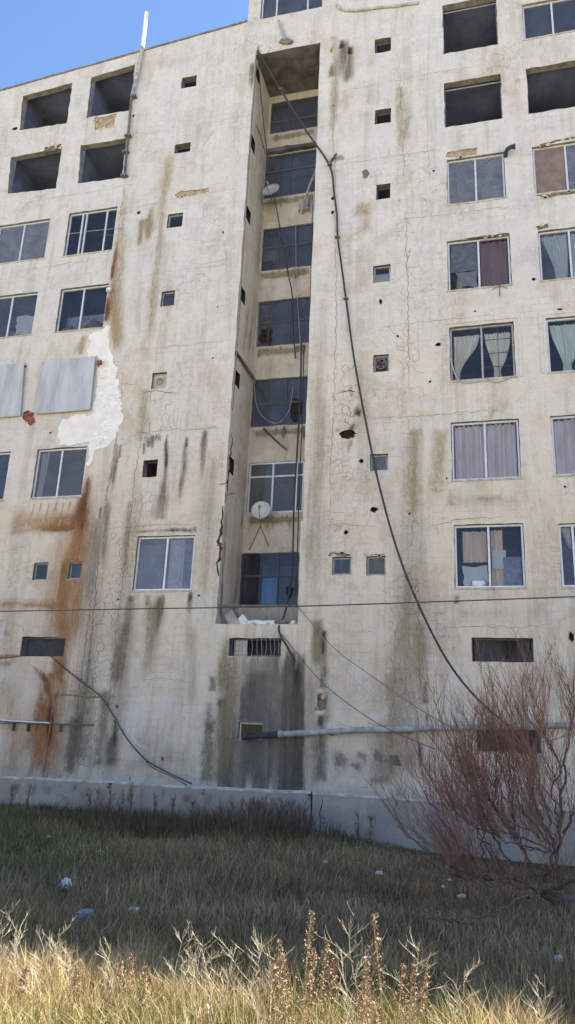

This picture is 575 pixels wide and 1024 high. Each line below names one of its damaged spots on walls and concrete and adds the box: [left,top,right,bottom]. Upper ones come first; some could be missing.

spalling [93,114,116,130]
water stain [329,42,352,112]
spalling [175,186,210,198]
rust [104,248,118,344]
spalling [22,410,36,426]
peeling [49,325,124,467]
crack [12,157,235,779]
water stain [139,398,168,518]
crack [319,27,549,828]
rust [2,480,89,771]
water stain [67,677,117,770]
water stain [207,654,304,805]